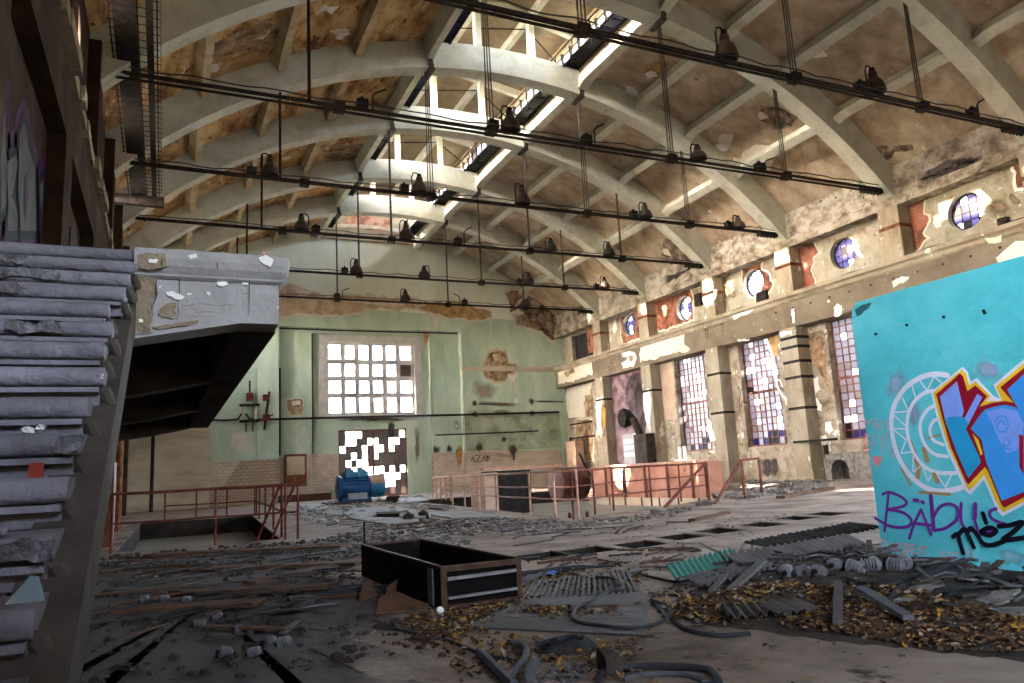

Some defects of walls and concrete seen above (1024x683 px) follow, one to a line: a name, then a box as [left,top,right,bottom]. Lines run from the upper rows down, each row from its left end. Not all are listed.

flaking render [210,18,275,79]
flaking render [330,29,351,40]
water stain [923,157,981,180]
flaking render [908,200,942,251]
peeling [135,252,201,335]
peeling [277,282,494,347]
flaking render [505,290,562,344]
flaking render [733,262,774,320]
flaking render [799,242,820,287]
flaking render [483,348,518,406]
flaking render [613,288,718,433]